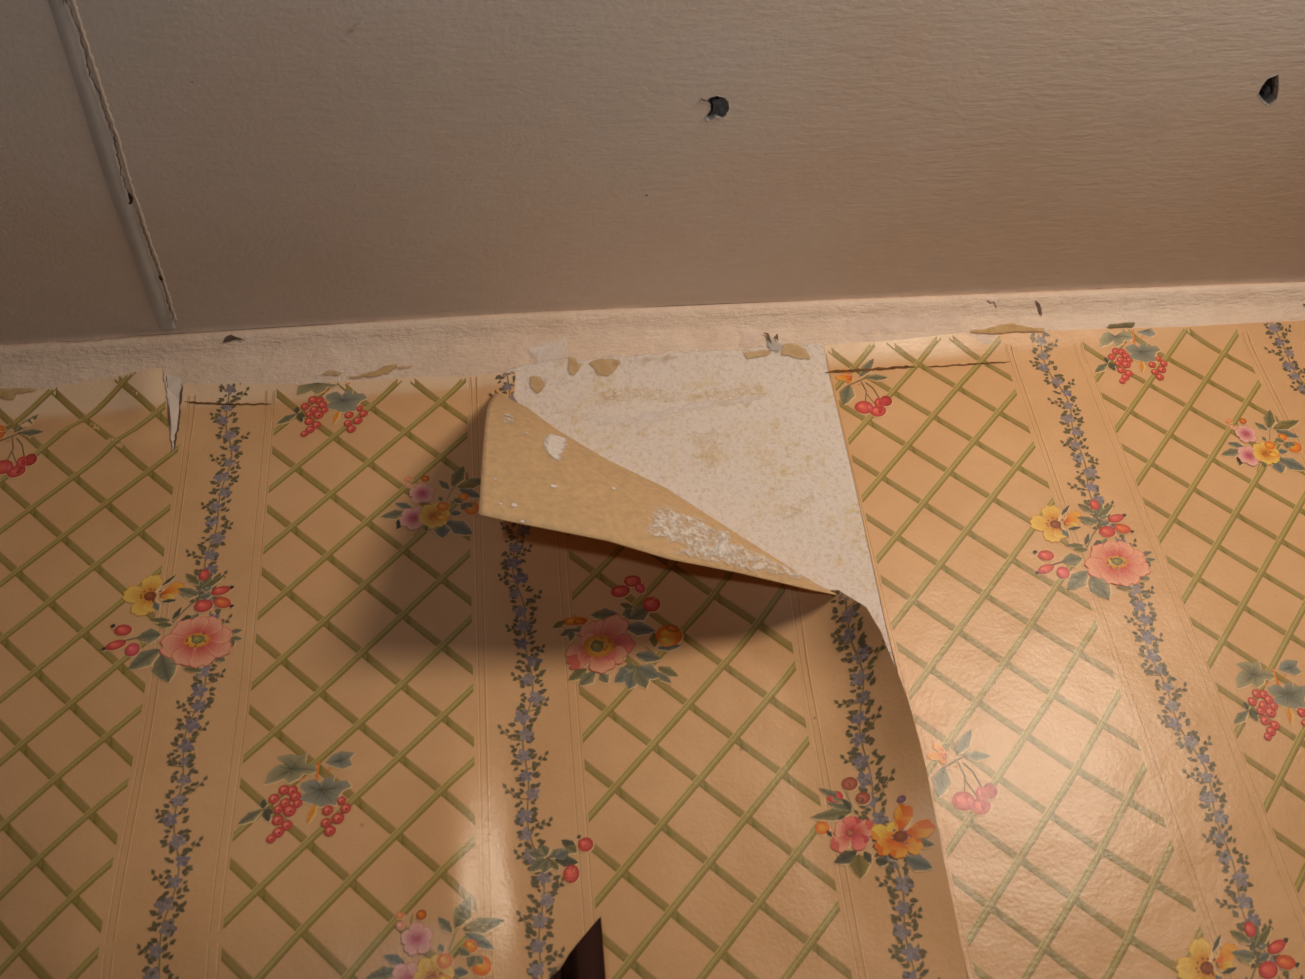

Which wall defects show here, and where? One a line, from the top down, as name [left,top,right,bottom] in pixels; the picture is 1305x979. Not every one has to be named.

crack [61,0,177,342]
spalling [699,95,729,121]
spalling [1258,74,1279,106]
flaking render [478,338,893,653]